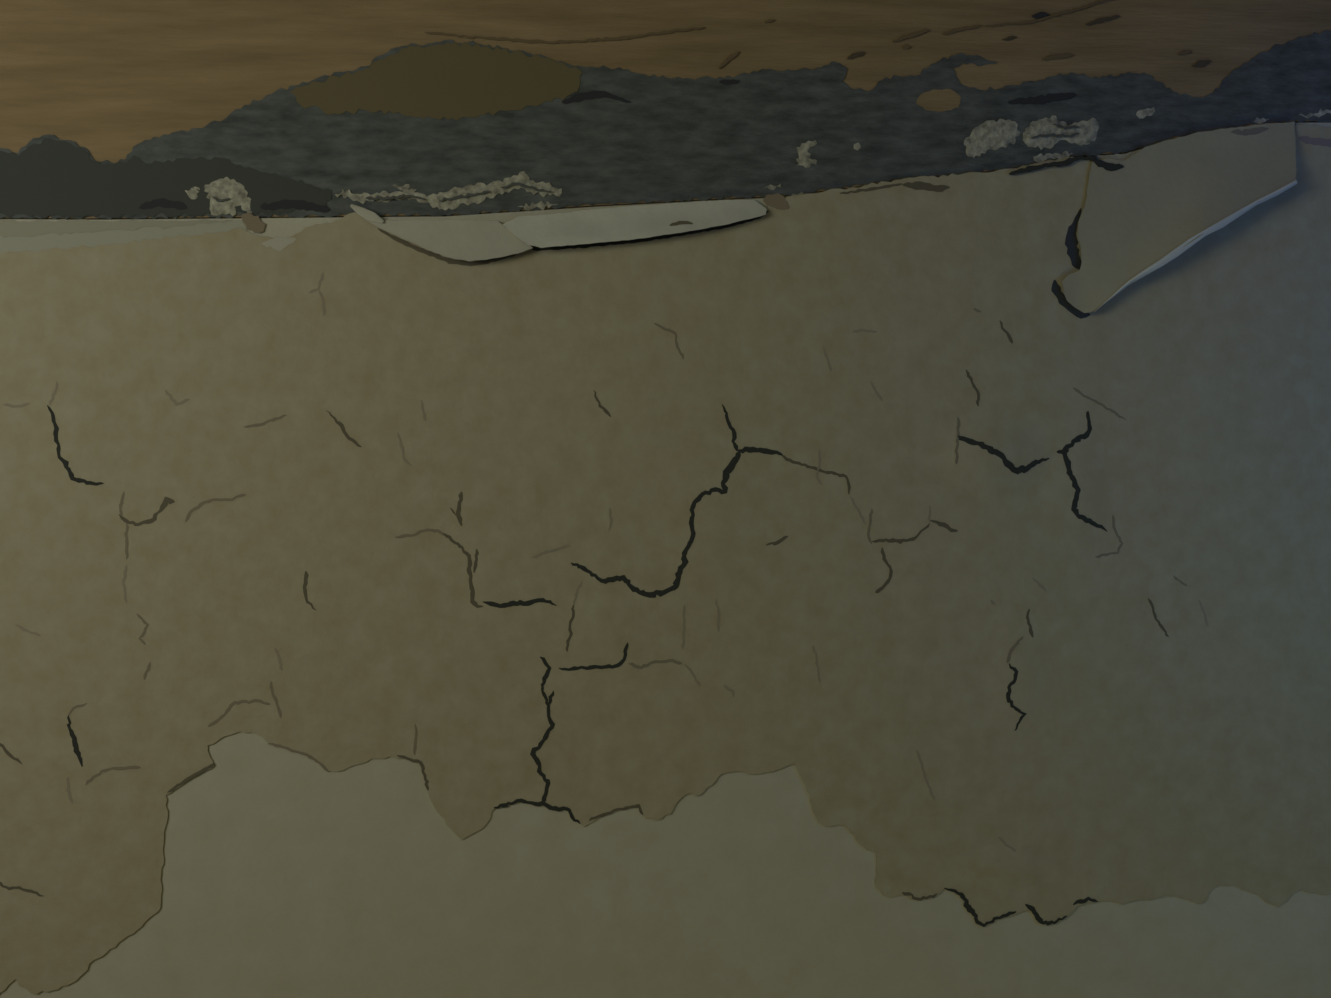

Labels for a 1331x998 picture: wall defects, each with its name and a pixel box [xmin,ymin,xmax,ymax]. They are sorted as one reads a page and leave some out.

peeling [916,89,961,112]
peeling [0,220,247,253]
crack [326,410,362,447]
crack [954,370,1126,558]
crack [3,382,246,680]
crack [303,571,316,610]
crack [395,400,958,824]
crack [1006,578,1047,731]
crack [66,703,141,803]
crack [167,763,214,793]
crack [208,648,328,772]
crack [902,888,1098,927]